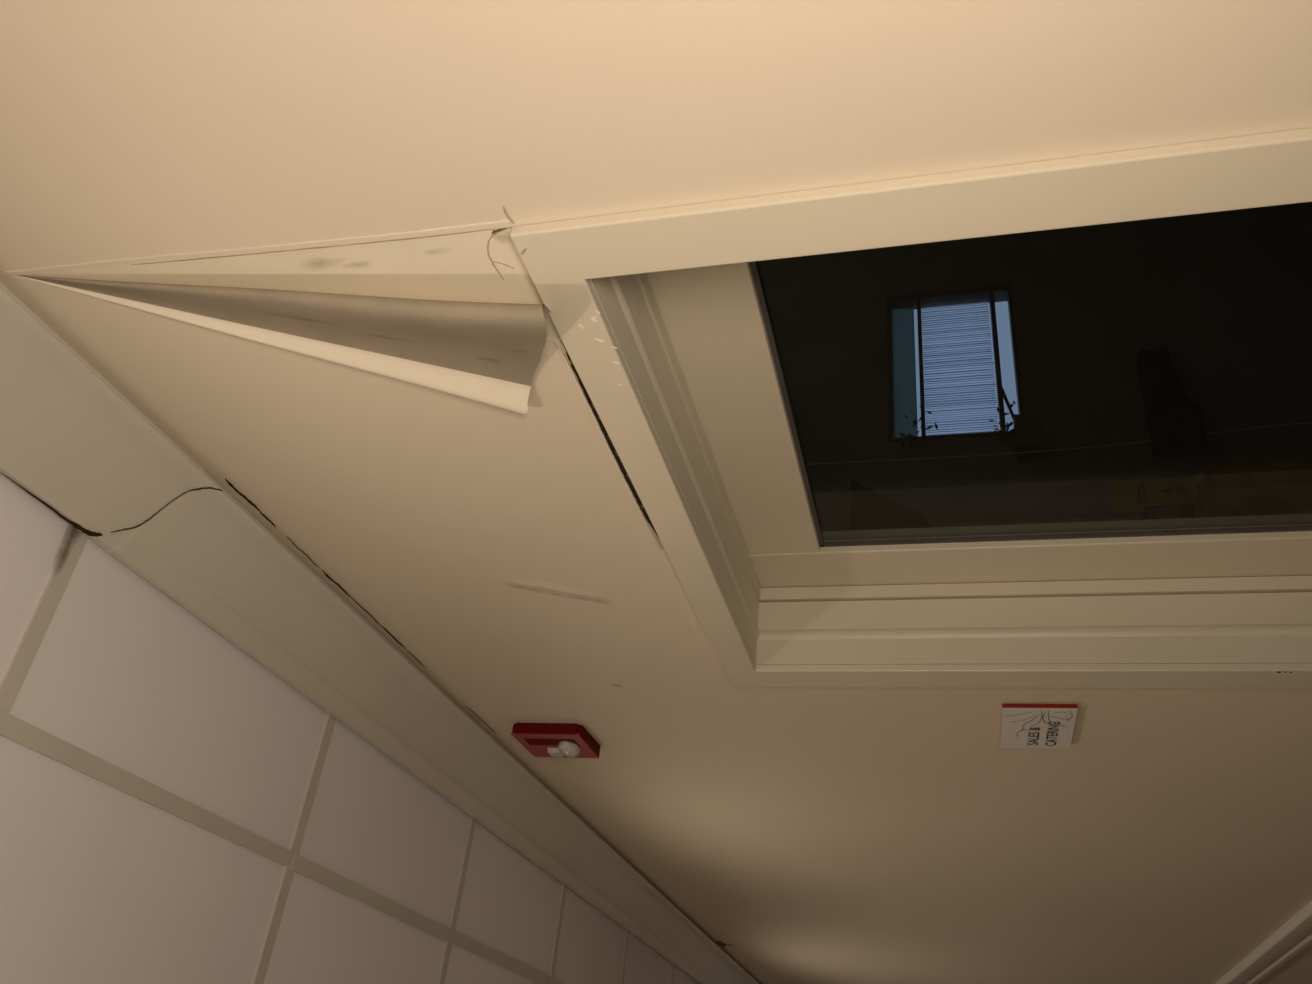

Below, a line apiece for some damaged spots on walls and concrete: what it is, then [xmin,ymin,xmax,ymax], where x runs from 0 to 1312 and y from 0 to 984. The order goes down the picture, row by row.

peeling [12,226,561,415]
crack [555,340,661,550]
crack [111,478,424,667]